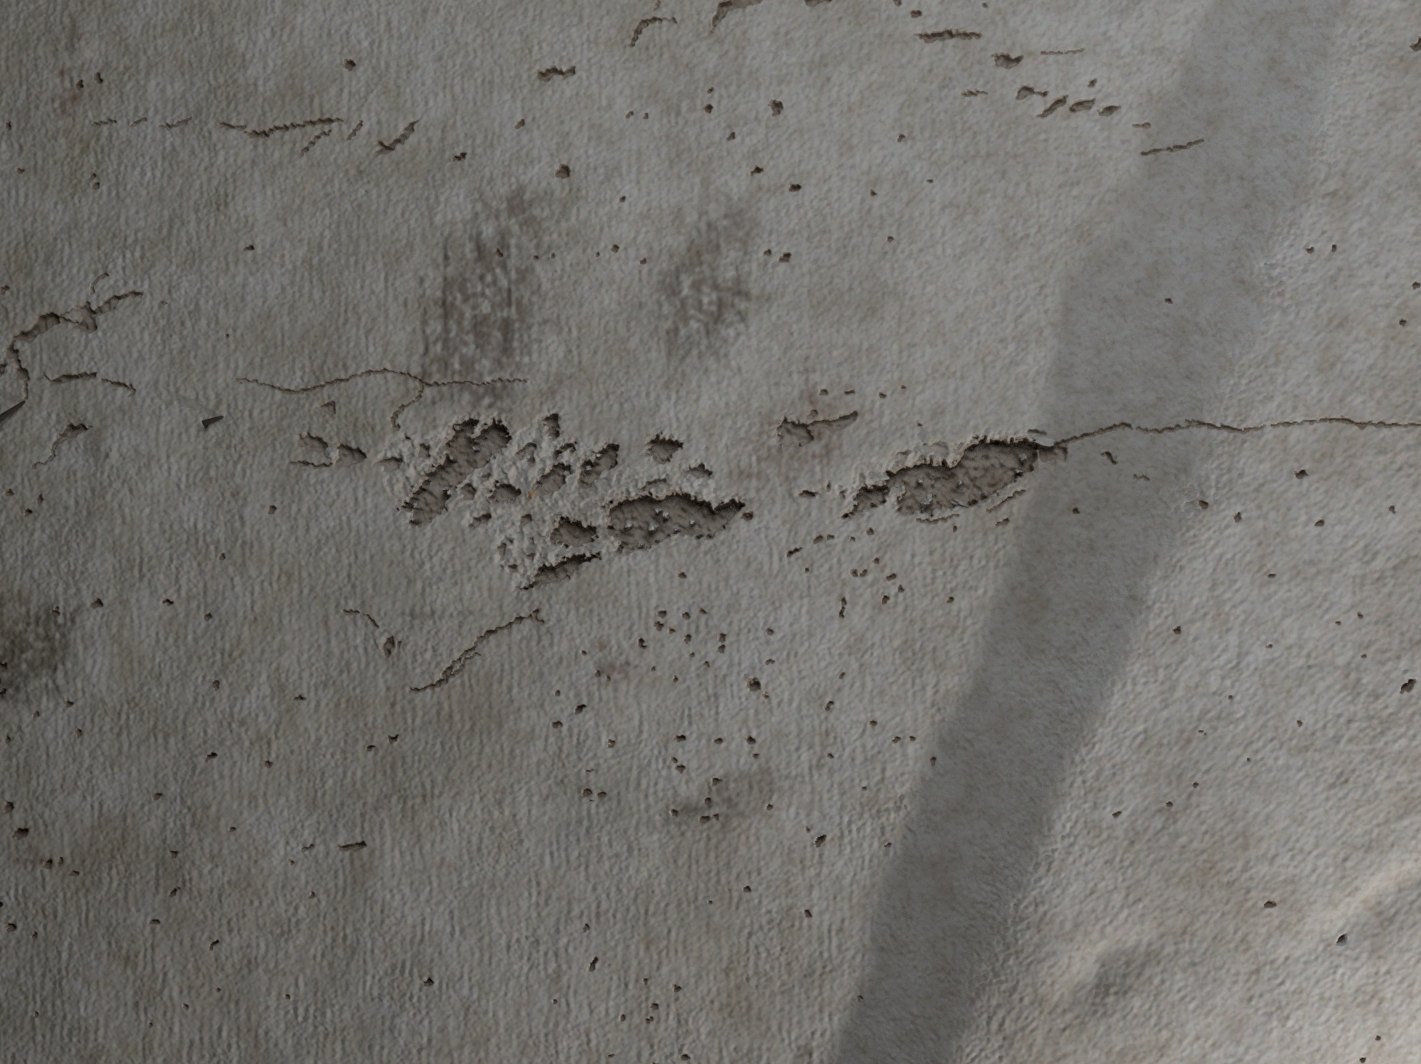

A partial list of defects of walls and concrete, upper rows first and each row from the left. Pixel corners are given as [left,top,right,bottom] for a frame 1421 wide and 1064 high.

flaking render [768,100,783,116]
crack [0,271,167,400]
flaking render [318,401,335,417]
crack [235,368,529,431]
flaking render [775,389,858,447]
crack [1053,415,1421,482]
flaking render [288,408,753,591]
flaking render [786,423,1068,557]
crack [342,609,402,658]
crack [408,609,544,694]